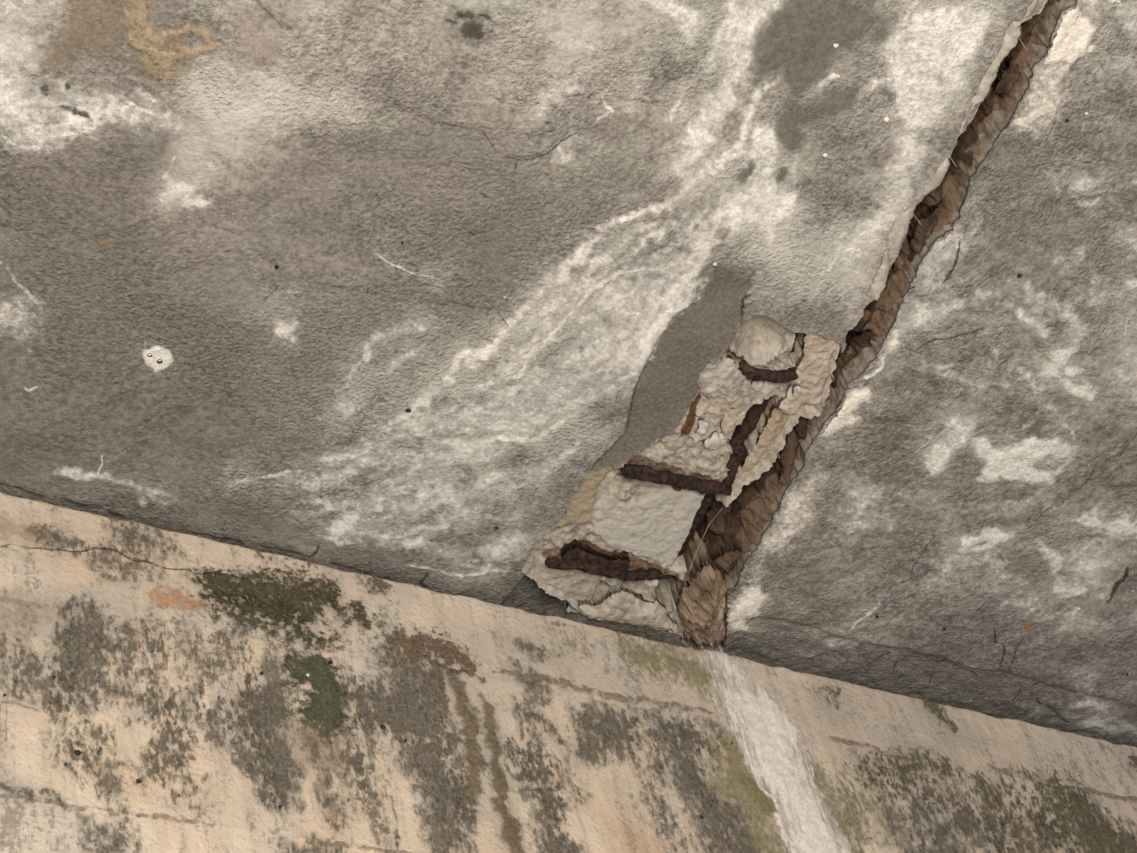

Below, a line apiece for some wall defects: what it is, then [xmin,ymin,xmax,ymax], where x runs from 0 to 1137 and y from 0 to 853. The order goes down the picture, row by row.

water stain [0,0,180,151]
water stain [62,0,221,61]
water stain [228,0,991,583]
crack [688,0,1060,595]
spalling [521,271,840,642]
water stain [357,572,392,595]
water stain [726,475,824,633]
water stain [0,588,863,853]
water stain [845,742,1137,853]
water stain [1071,674,1137,738]